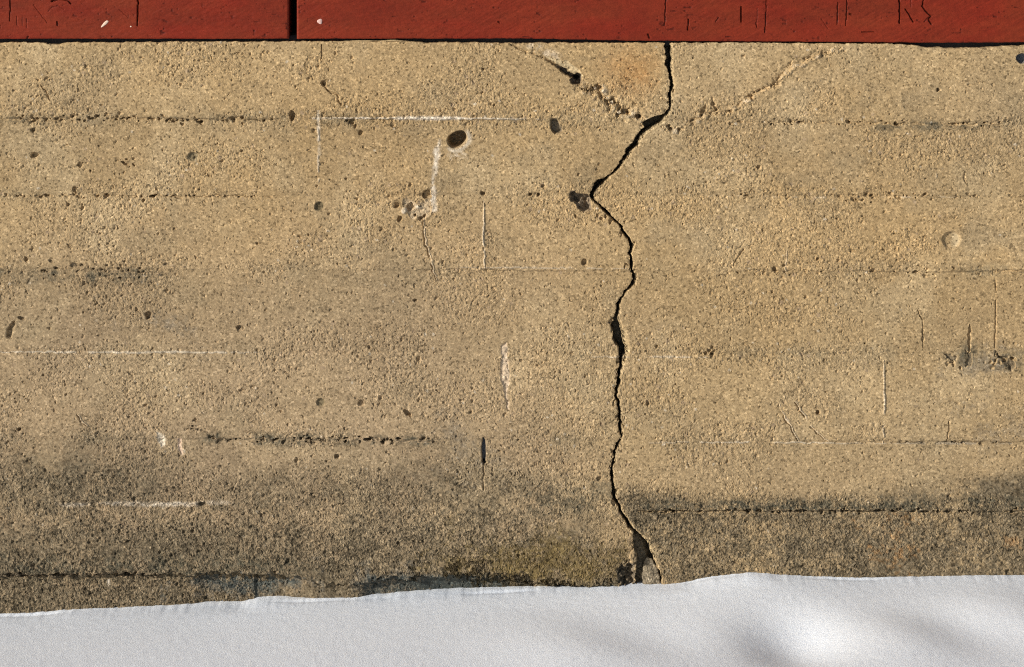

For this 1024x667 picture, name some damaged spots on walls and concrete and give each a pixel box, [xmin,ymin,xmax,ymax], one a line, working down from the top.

crack [508,0,848,584]